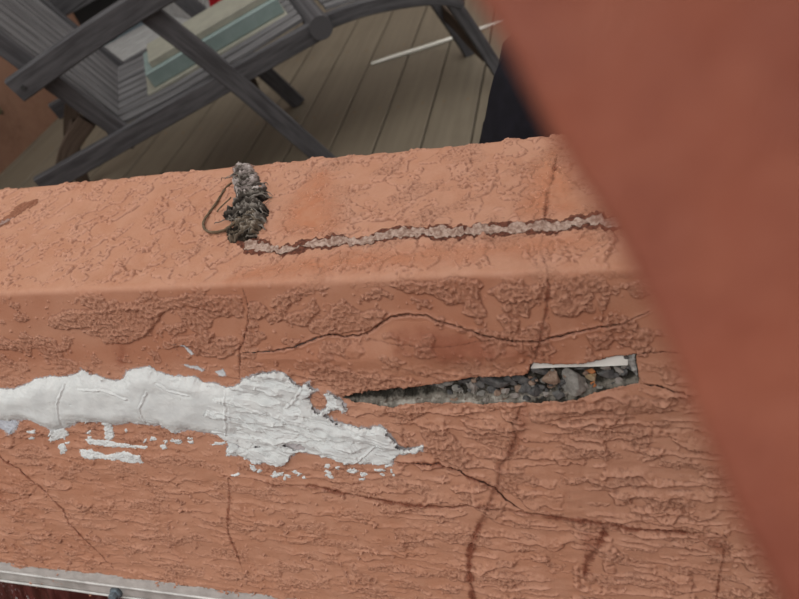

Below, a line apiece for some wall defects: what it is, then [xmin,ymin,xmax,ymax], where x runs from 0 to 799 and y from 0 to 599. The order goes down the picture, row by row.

crack [236,202,609,258]
spalling [310,354,640,420]
crack [398,462,517,507]
crack [466,524,481,599]